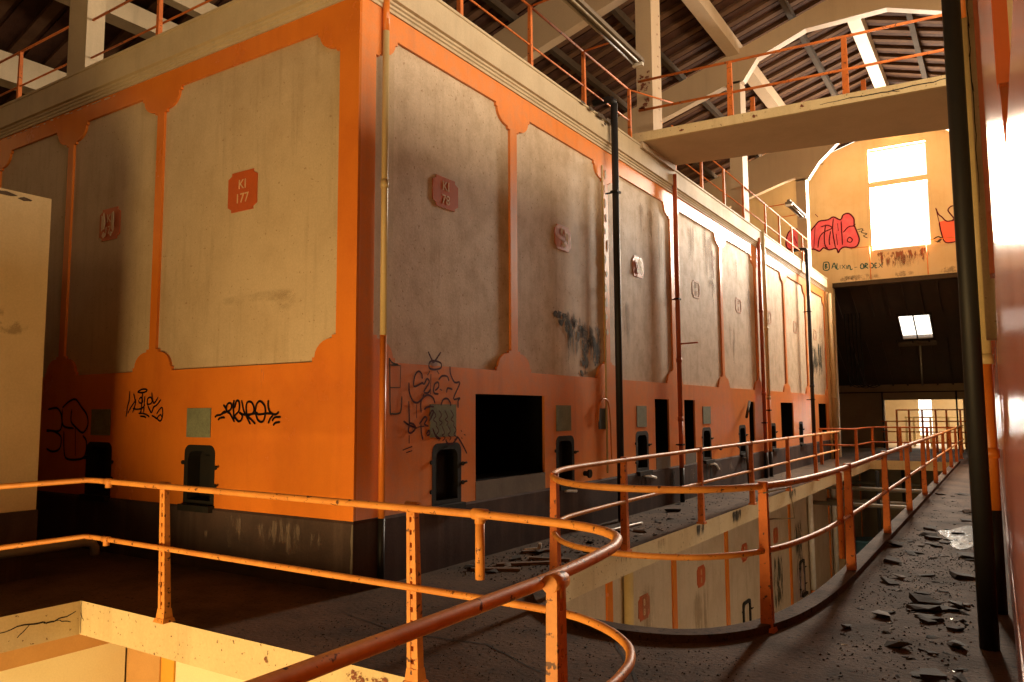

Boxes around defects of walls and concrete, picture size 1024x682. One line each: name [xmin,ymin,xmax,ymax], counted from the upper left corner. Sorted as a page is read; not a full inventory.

leakage [552,311,600,377]
crack [1,600,84,638]